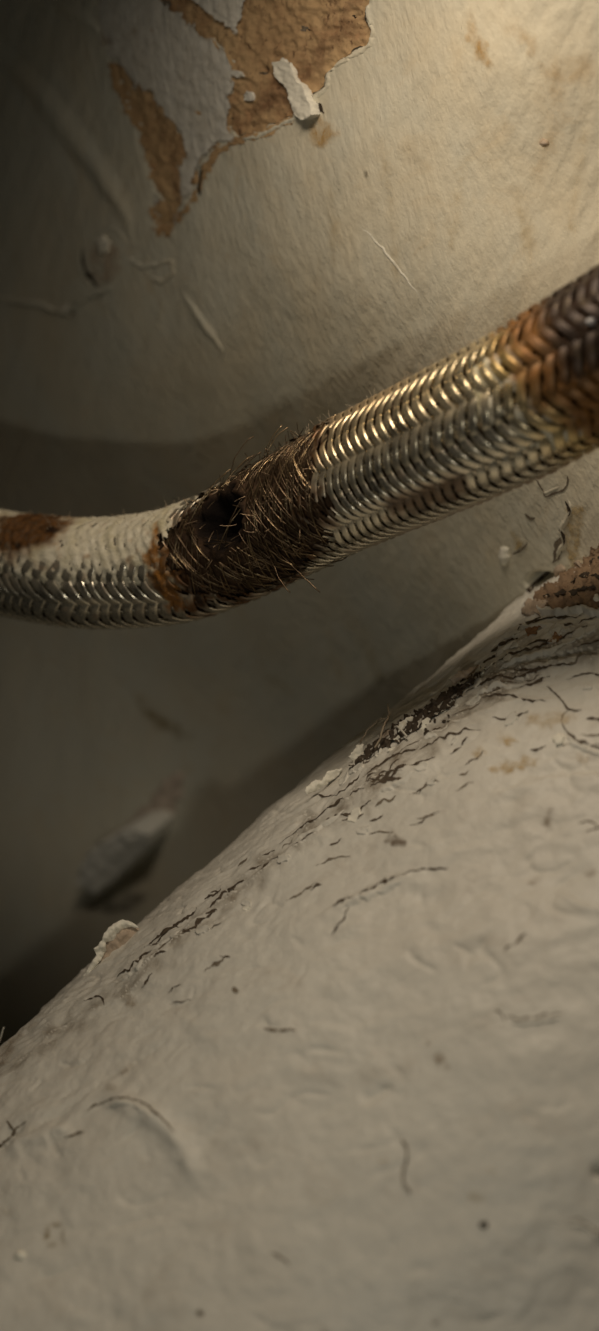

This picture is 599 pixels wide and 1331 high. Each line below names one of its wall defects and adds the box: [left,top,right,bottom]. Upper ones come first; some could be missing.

peeling [94,0,375,238]
crack [84,556,599,1004]
peeling [82,920,139,978]